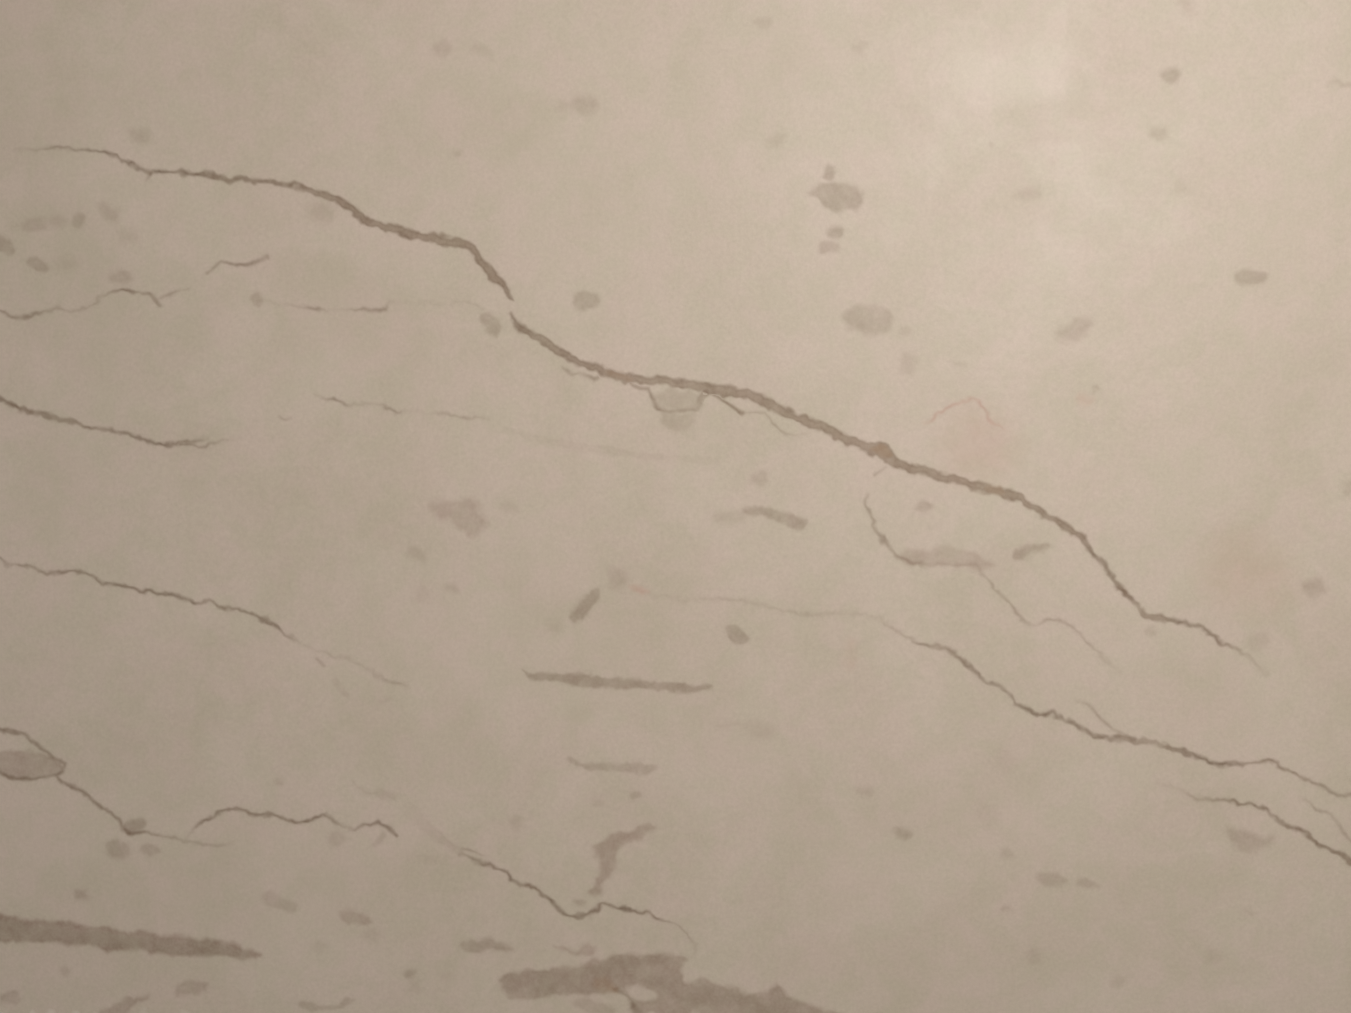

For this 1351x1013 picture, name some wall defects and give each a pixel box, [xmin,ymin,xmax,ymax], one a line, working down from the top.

crack [0,143,1271,678]
crack [0,555,410,705]
damp [520,667,714,696]
crack [601,588,1351,868]
crack [0,726,699,961]
damp [571,821,659,909]
damp [0,910,265,979]
damp [457,933,848,1013]